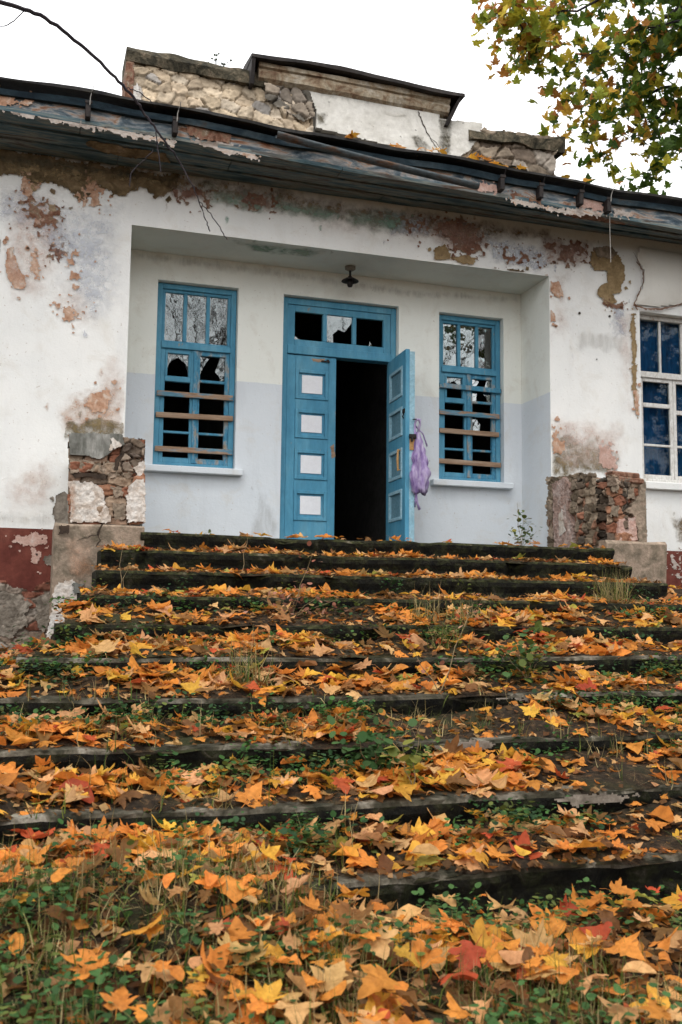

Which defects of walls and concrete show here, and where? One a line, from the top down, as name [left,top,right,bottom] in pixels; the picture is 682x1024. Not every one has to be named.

spalling [0,149,283,334]